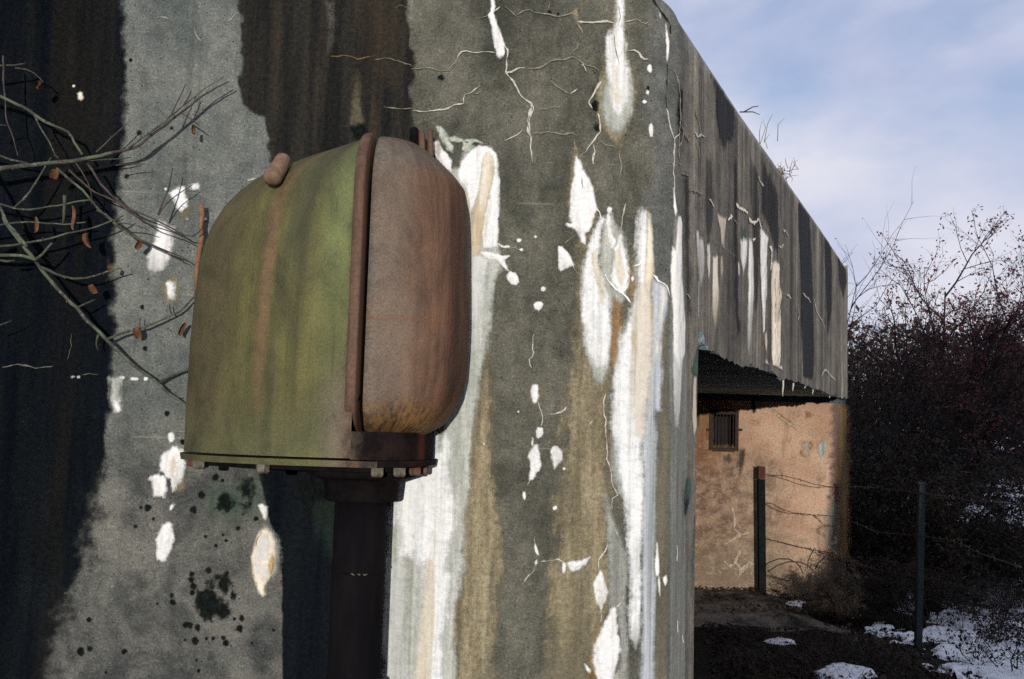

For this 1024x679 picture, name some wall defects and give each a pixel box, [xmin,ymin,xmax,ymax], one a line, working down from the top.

water stain [238,0,415,163]
crack [375,0,671,164]
water stain [596,0,637,176]
water stain [0,0,148,679]
peeling [140,439,186,561]
peeling [251,504,278,596]
water stain [259,469,335,679]
water stain [381,145,509,679]
crack [516,538,565,602]
peeling [528,427,562,480]
water stain [546,140,782,679]
crack [724,507,754,576]